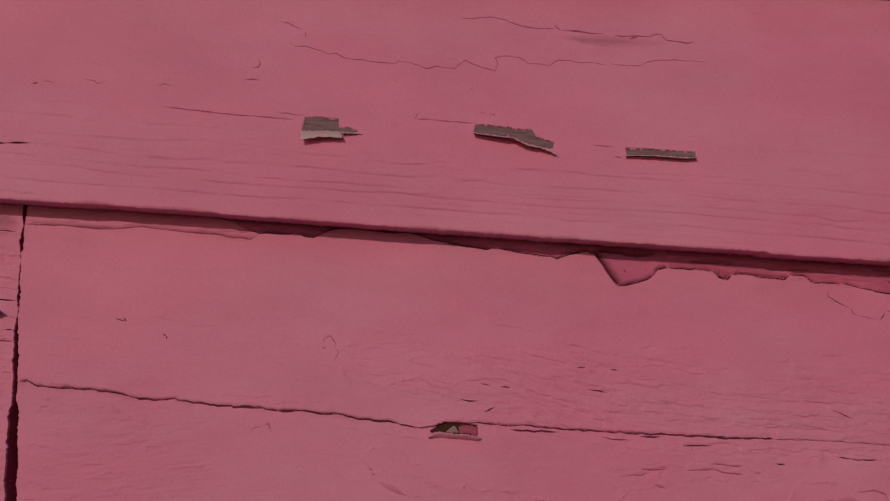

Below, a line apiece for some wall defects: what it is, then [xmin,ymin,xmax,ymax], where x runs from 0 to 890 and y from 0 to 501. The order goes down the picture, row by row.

crack [283,17,701,71]
peeling [300,116,362,140]
peeling [473,124,556,154]
peeling [625,147,697,159]
peeling [29,217,353,240]
peeling [371,230,890,294]
crack [21,381,414,430]
peeling [427,422,480,441]
crack [437,383,880,475]
crack [628,467,666,489]